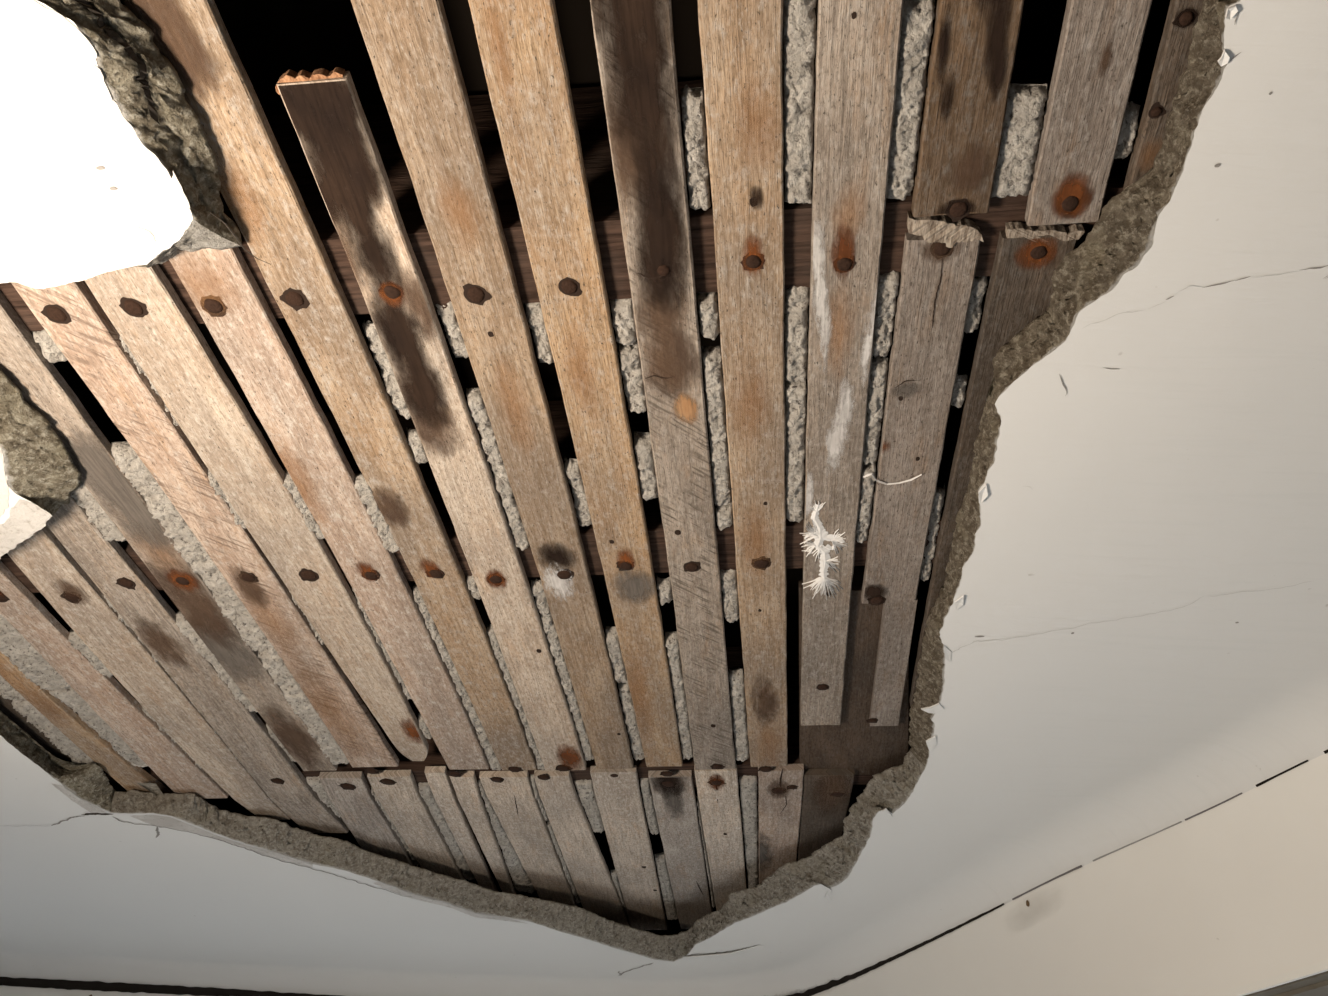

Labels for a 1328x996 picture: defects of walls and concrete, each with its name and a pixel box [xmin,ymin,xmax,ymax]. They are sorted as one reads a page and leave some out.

flaking render [26,0,242,270]
damp [278,81,452,454]
damp [590,0,699,394]
rust [832,230,854,274]
rust [1054,176,1091,216]
flaking render [908,0,1241,767]
rust [486,570,506,587]
damp [800,501,848,599]
crack [0,977,342,996]
crack [7,813,409,897]
flaking render [0,710,926,962]
crack [786,749,1328,996]